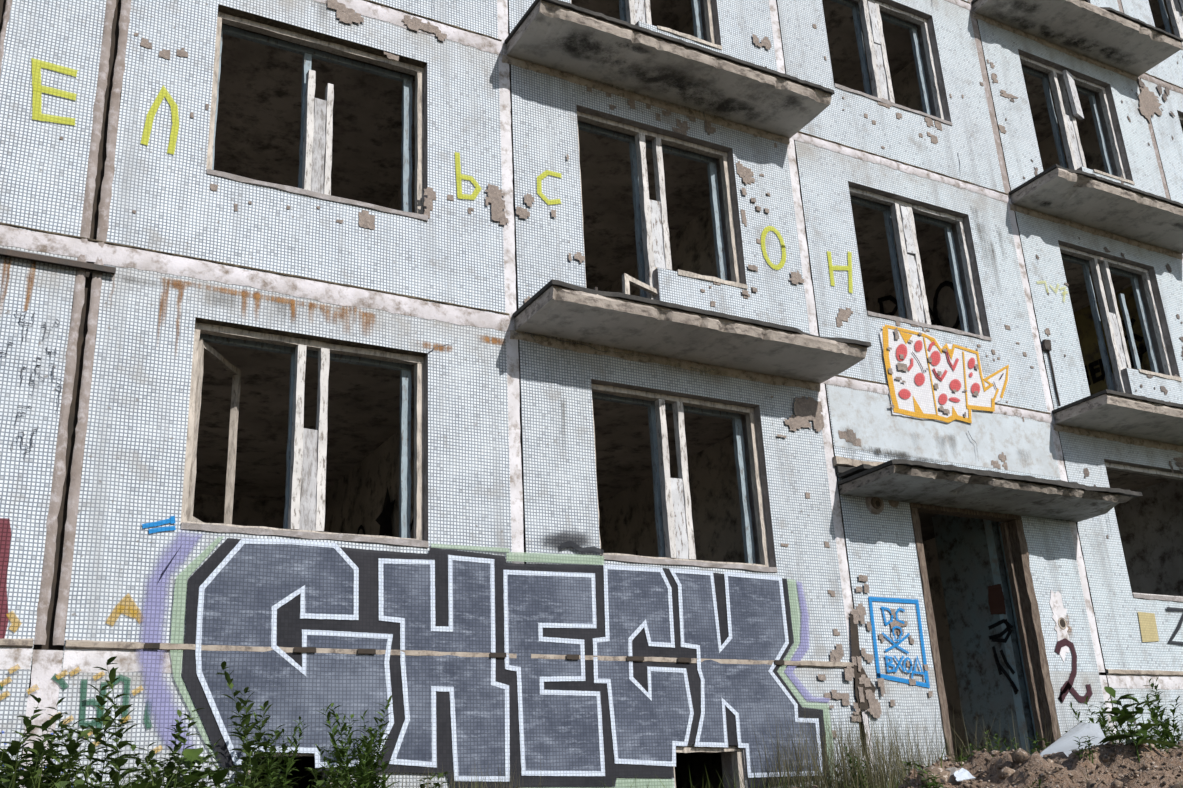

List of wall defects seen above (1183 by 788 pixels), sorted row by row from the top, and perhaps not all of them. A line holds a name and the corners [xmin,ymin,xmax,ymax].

peeling [327,0,364,24]
peeling [1121,79,1175,123]
peeling [359,210,375,229]
peeling [423,187,454,219]
peeling [468,183,535,225]
peeling [736,161,771,226]
corrosion [159,280,185,325]
corrosion [207,286,374,326]
peeling [777,396,824,438]
flaking render [838,429,861,447]
flaking render [991,452,1008,470]
spalling [818,575,914,722]